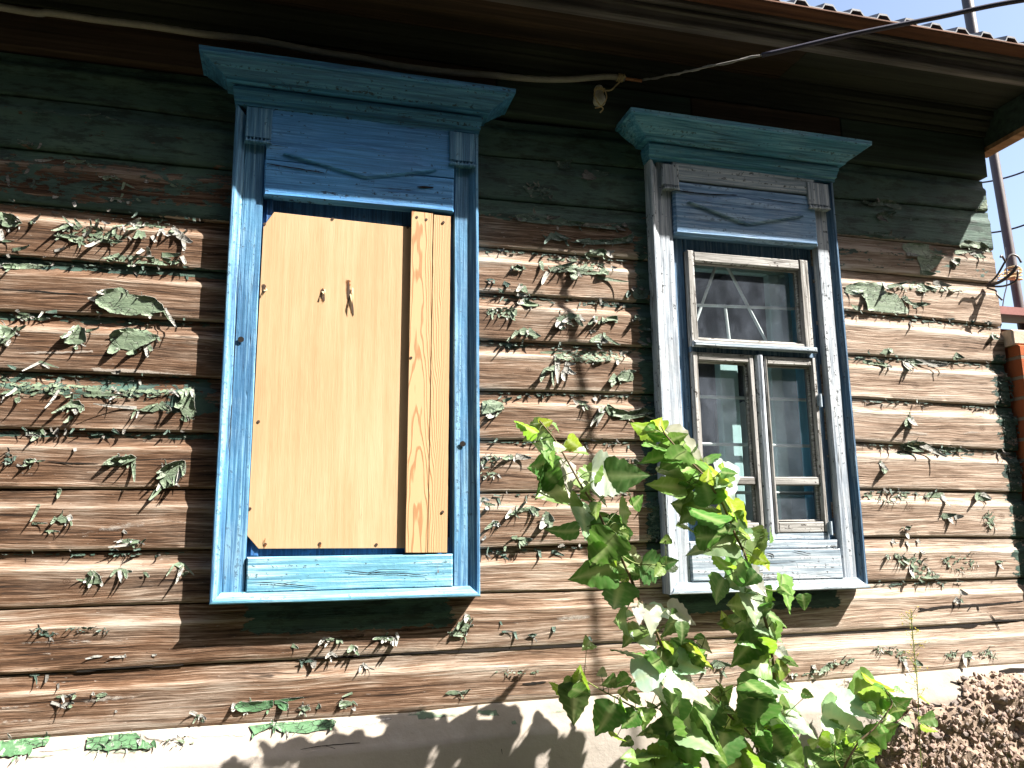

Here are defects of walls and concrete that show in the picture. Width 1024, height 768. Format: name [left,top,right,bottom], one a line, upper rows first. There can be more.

peeling [0,137,201,280]
peeling [0,287,192,357]
peeling [482,227,653,466]
peeling [844,240,1000,340]
peeling [0,361,196,441]
peeling [856,348,1024,486]
peeling [103,453,137,482]
peeling [149,459,186,500]
peeling [76,530,149,588]
peeling [874,525,979,604]
peeling [291,637,375,673]
peeling [372,632,399,646]